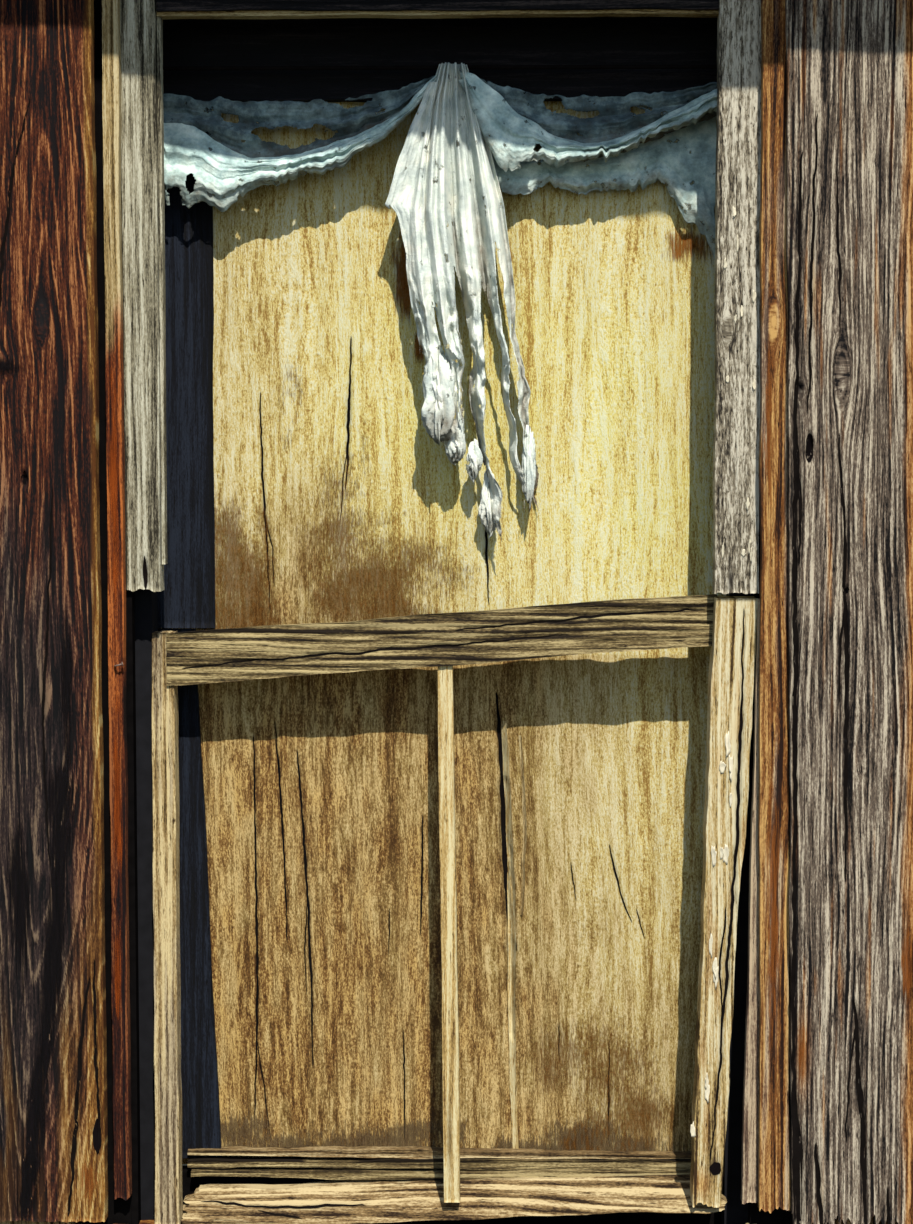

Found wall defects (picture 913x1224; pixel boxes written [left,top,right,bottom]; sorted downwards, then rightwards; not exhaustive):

crack [259,392,275,609]
crack [340,338,352,516]
leakage [296,465,458,622]
crack [253,723,314,1134]
crack [609,844,645,939]